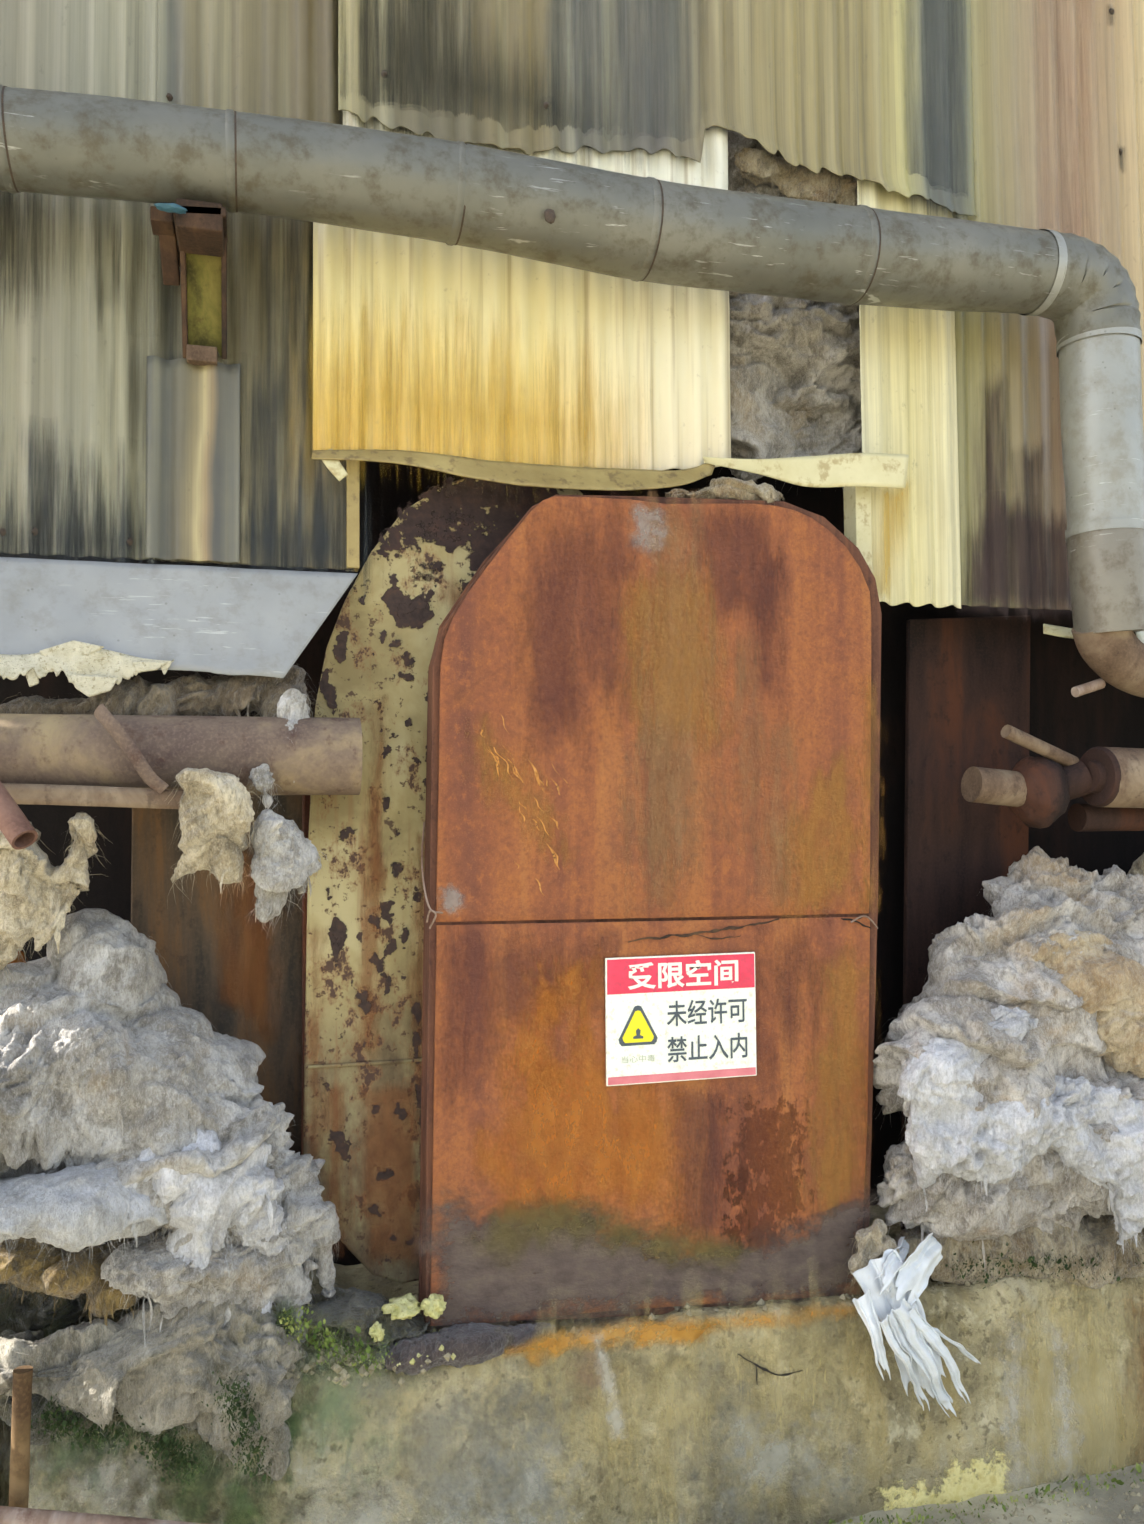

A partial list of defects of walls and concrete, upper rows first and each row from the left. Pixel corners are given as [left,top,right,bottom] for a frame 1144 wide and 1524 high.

peeling [0,640,174,697]
peeling [318,630,349,716]
peeling [374,699,412,759]
peeling [339,827,356,842]
peeling [382,797,401,836]
peeling [390,862,403,878]
peeling [328,886,424,1015]
peeling [328,1126,353,1162]
water stain [422,1198,870,1358]
water stain [276,1310,295,1336]
water stain [284,1407,310,1438]
water stain [52,1425,263,1524]